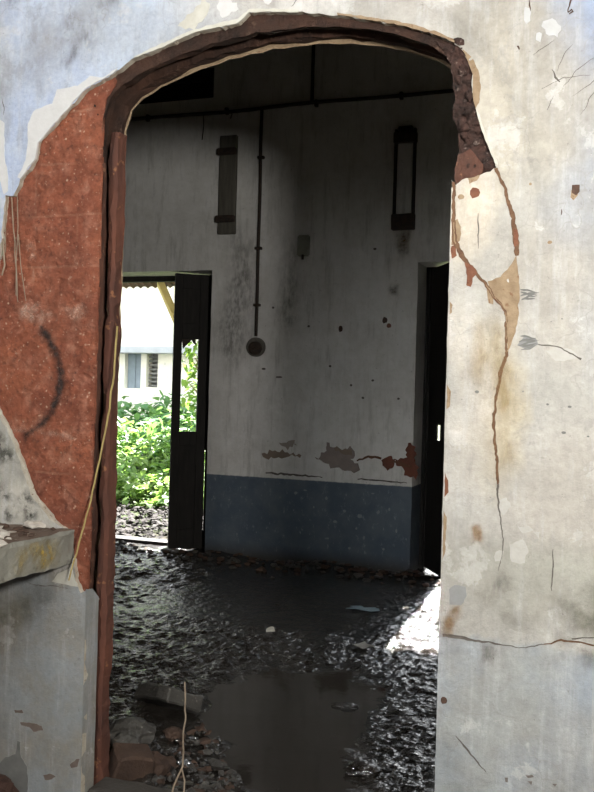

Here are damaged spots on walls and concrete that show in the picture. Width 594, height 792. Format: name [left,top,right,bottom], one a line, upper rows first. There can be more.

peeling [133,0,299,58]
spalling [0,69,117,589]
crack [451,168,520,571]
peeling [262,440,301,460]
peeling [315,442,419,479]
crack [442,634,594,648]